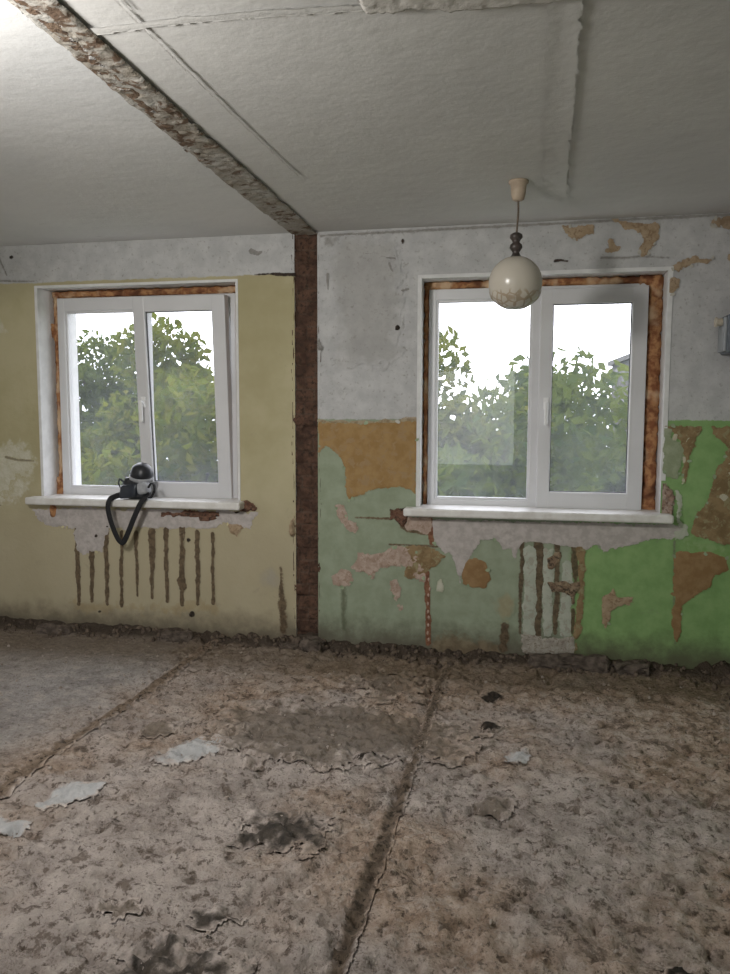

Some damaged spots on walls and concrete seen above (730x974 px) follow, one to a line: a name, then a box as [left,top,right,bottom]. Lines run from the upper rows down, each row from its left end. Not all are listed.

peeling [14,0,206,160]
peeling [561,224,595,241]
peeling [612,218,660,257]
peeling [669,255,714,296]
flaking render [289,234,419,634]
peeling [0,437,39,508]
peeling [32,500,259,556]
peeling [331,423,730,654]